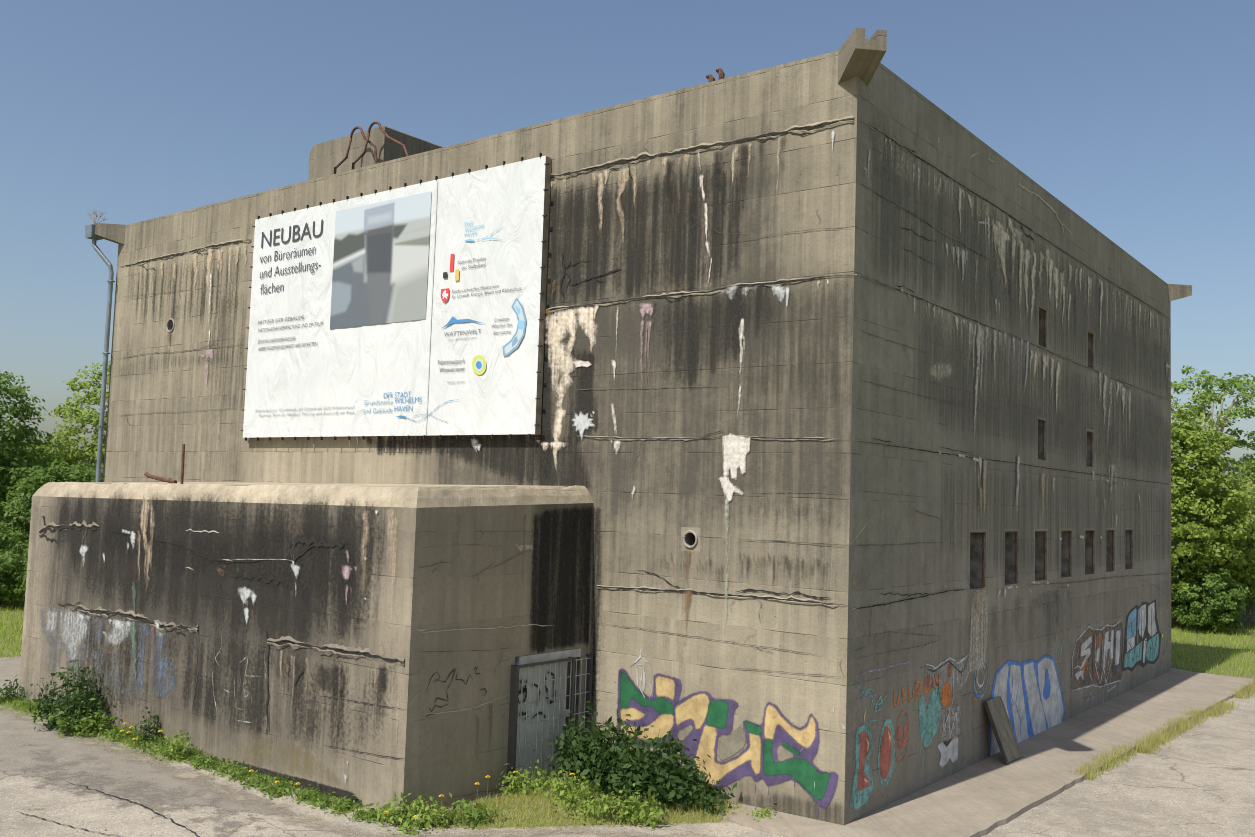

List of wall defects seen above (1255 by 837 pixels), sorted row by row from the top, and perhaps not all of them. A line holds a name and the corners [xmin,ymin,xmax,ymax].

crack [39,512,99,543]
damp [137,246,246,318]
damp [349,145,792,488]
damp [719,433,765,509]
crack [739,489,944,546]
crack [545,111,1171,402]
crack [585,330,1169,485]
damp [864,137,1170,551]
damp [33,495,395,746]
damp [519,508,600,711]
crack [597,570,973,677]